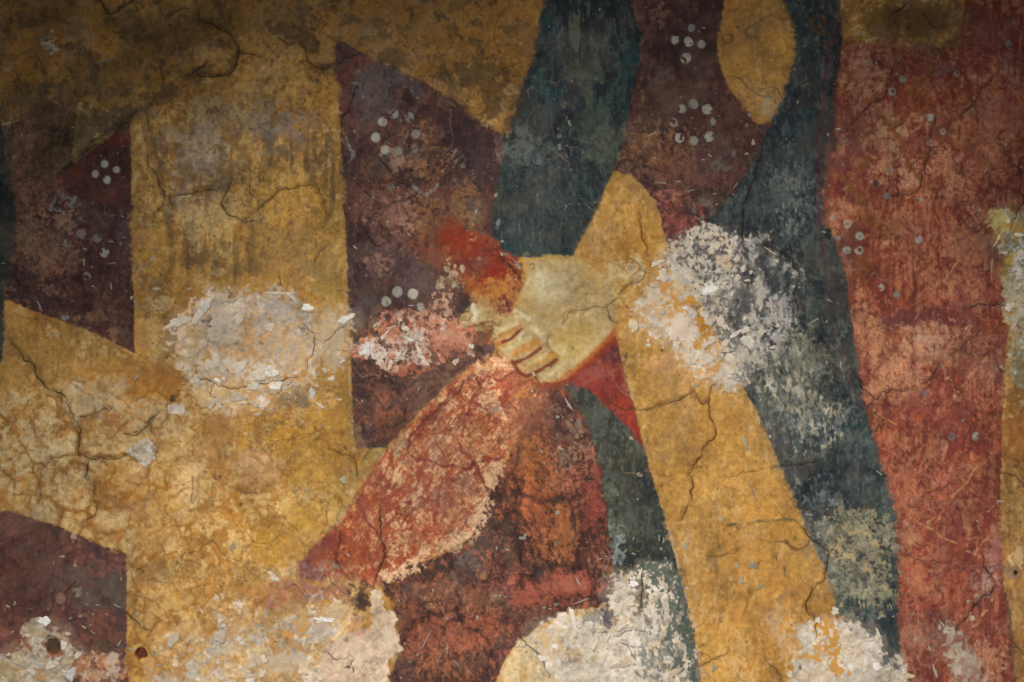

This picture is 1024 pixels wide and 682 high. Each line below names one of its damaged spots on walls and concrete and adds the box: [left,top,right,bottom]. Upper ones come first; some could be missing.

crack [100,0,134,15]
crack [168,0,261,78]
crack [280,39,360,69]
crack [147,155,327,263]
flaking render [130,244,479,432]
flaking render [616,217,850,466]
crack [10,340,160,523]
crack [609,382,718,521]
crack [723,459,824,479]
flaking render [0,571,410,682]
flaking render [513,534,717,682]
flaking render [782,505,915,682]